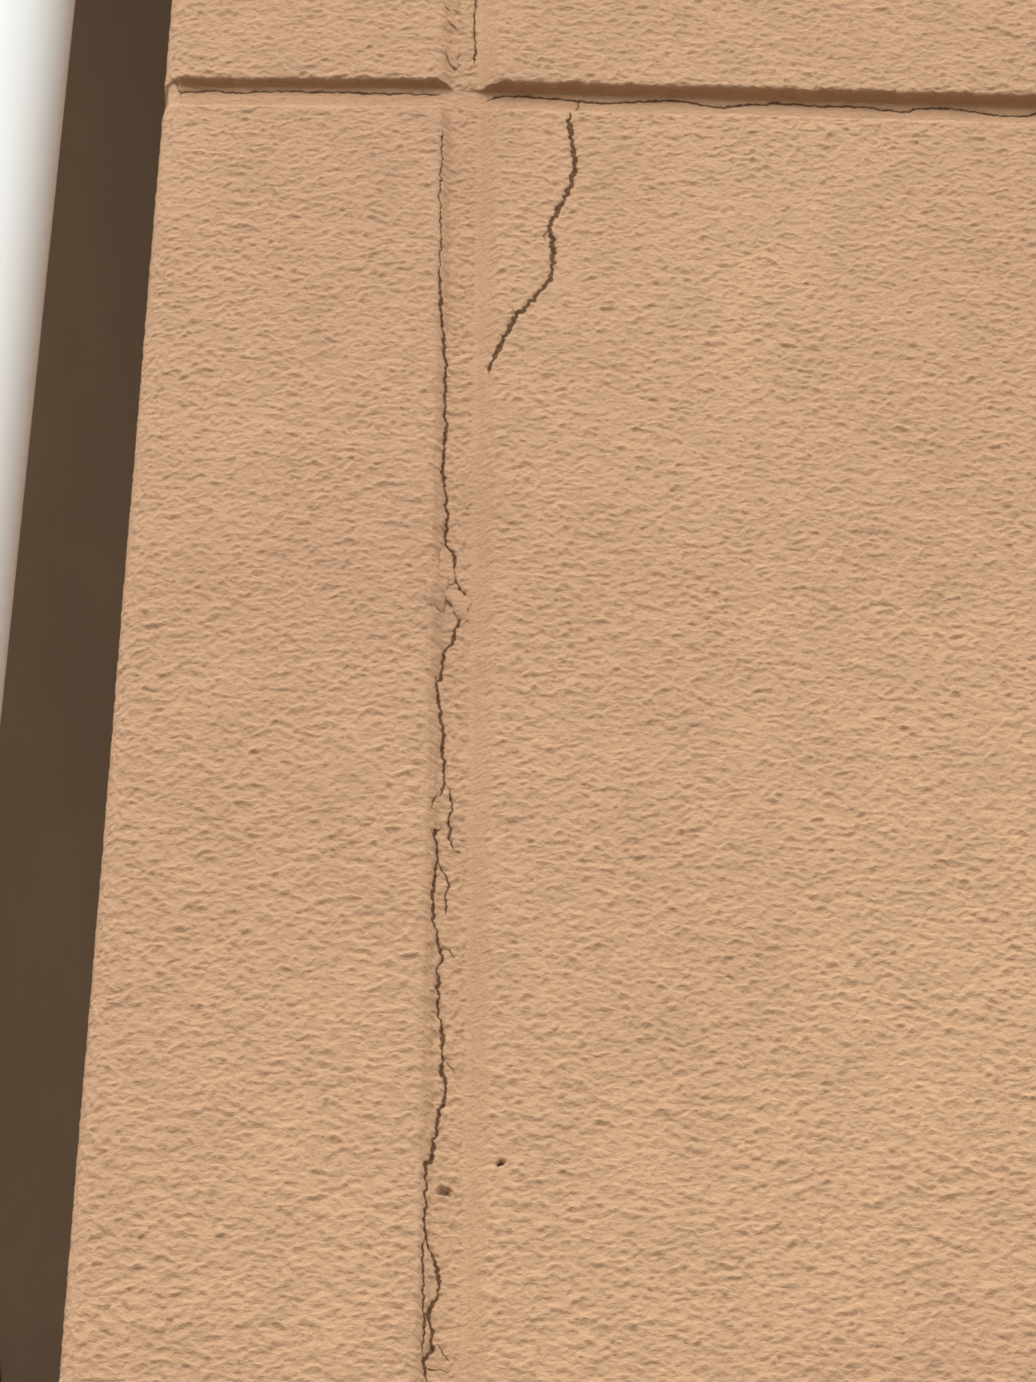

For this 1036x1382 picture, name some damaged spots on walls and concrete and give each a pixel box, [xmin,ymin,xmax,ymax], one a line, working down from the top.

crack [421,131,466,1382]
crack [486,95,1036,374]